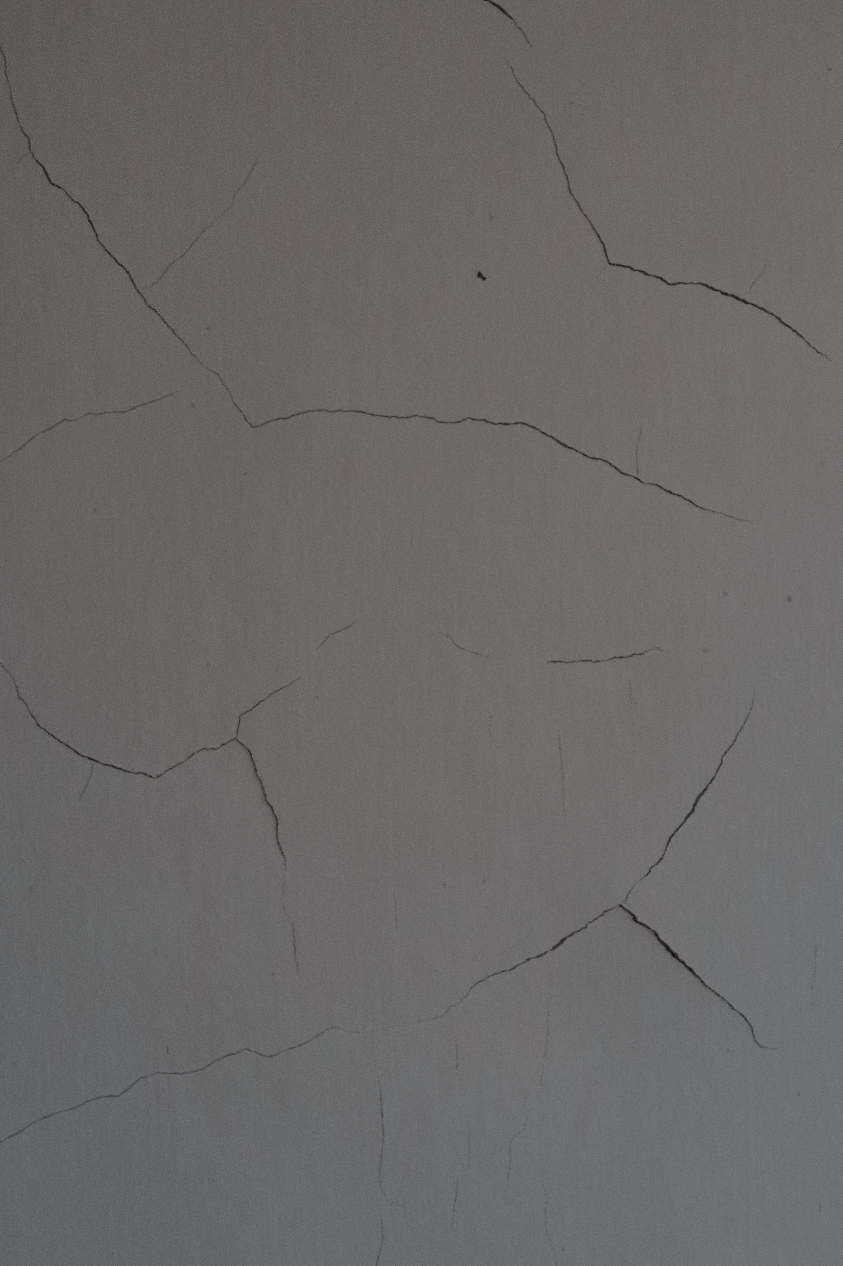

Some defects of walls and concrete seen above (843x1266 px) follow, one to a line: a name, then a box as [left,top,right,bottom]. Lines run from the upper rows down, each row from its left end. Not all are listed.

crack [0,42,727,517]
crack [480,0,832,362]
crack [0,660,302,872]
crack [442,692,780,1050]